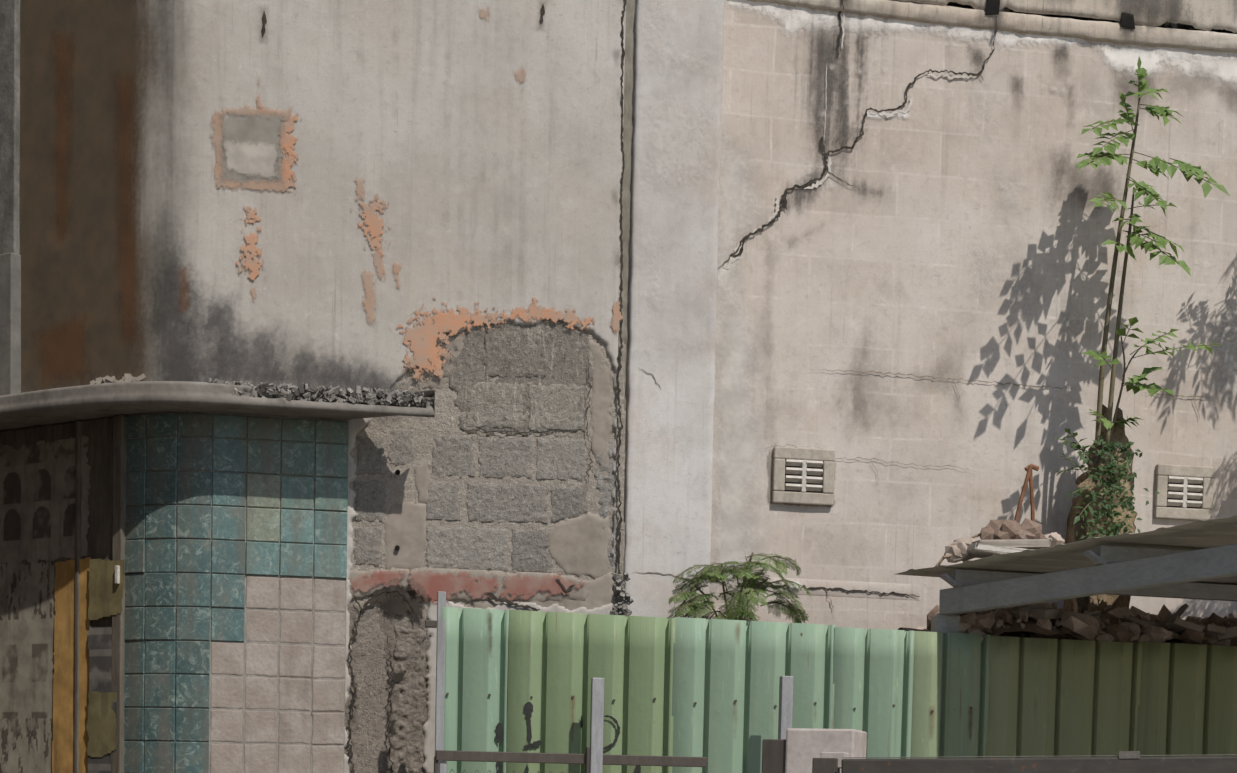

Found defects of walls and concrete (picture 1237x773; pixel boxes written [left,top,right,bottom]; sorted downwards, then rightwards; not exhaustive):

leakage [725,0,1237,145]
leakage [19,0,179,393]
peeling [235,206,266,299]
peeling [210,83,302,195]
peeling [351,178,401,287]
leakage [788,171,828,207]
crack [718,0,998,281]
leakage [165,310,388,390]
flaking render [207,291,634,773]